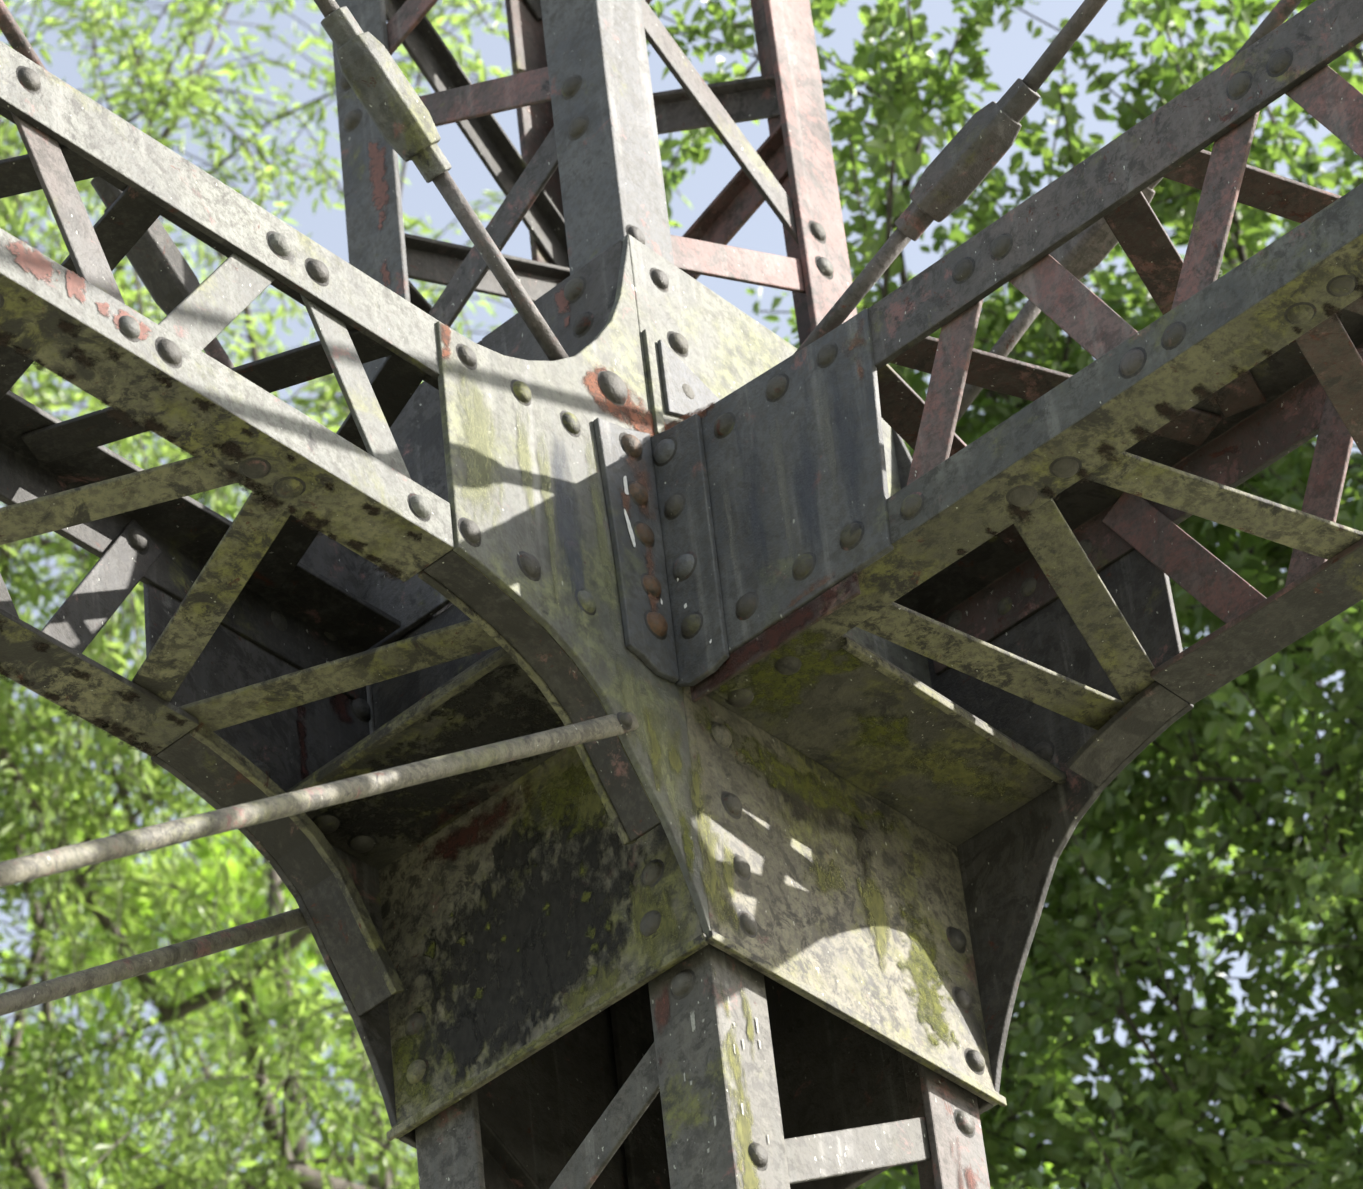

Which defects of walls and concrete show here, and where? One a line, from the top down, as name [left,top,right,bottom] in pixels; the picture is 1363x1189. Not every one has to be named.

corrosion [0,319,123,381]
corrosion [151,374,172,387]
corrosion [583,367,714,437]
corrosion [101,398,401,580]
water stain [353,664,564,775]
water stain [321,755,538,843]
corrosion [420,780,531,868]
water stain [678,810,694,878]
water stain [767,780,891,969]
water stain [412,804,646,1086]
water stain [916,959,948,1045]